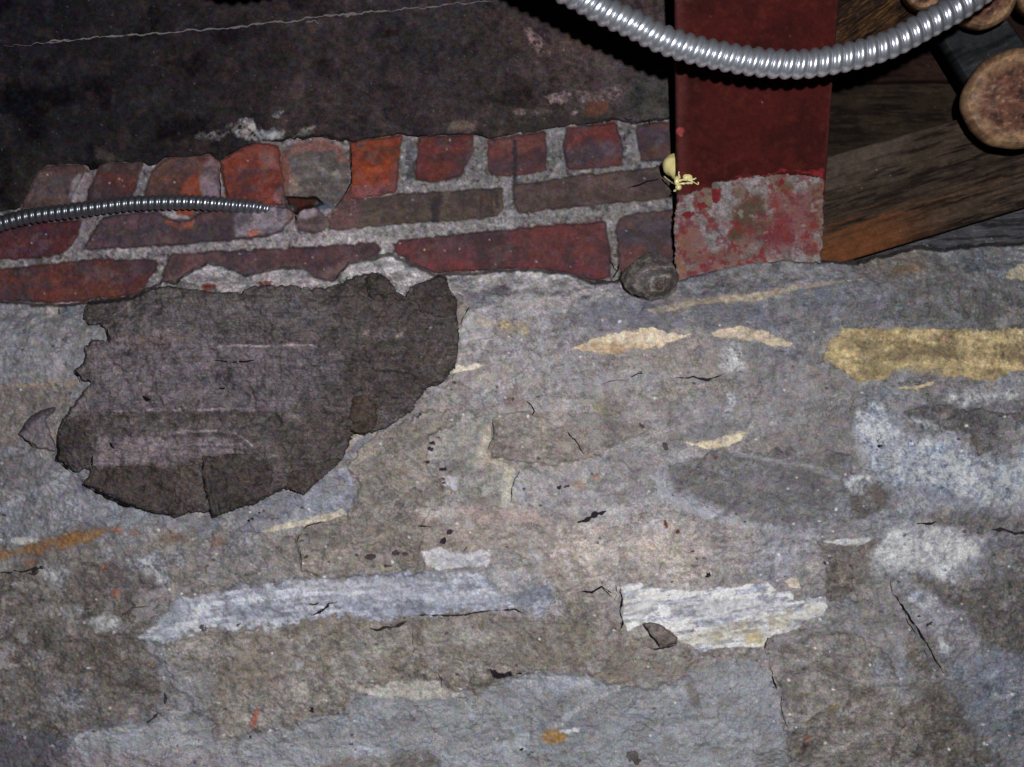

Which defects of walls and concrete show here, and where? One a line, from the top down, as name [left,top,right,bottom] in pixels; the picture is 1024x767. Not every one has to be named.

peeling [674,168,824,280]
crack [890,580,945,675]